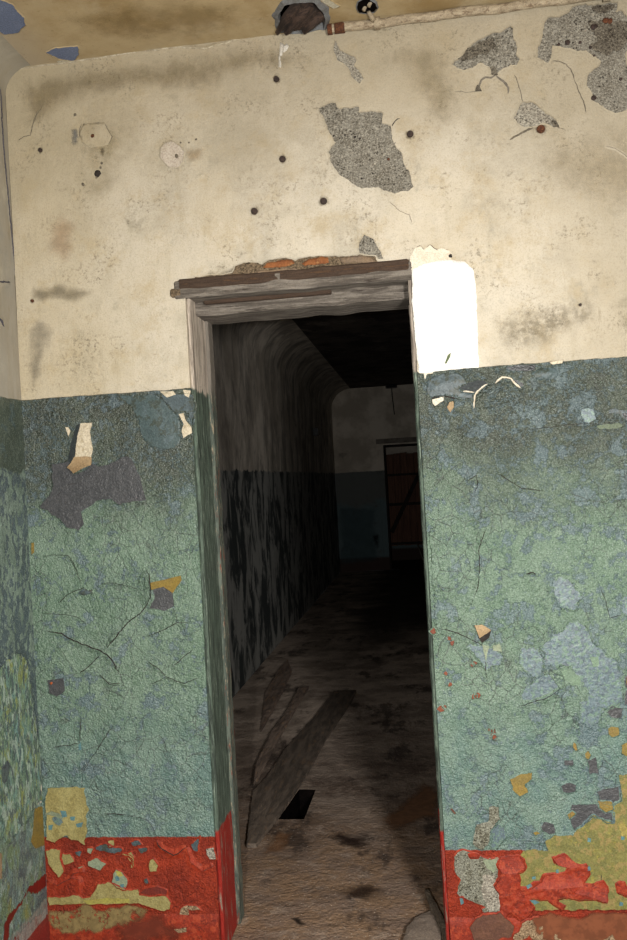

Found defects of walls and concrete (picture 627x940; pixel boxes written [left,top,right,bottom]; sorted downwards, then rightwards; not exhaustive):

peeling [0,0,27,35]
flaking render [451,25,563,140]
flaking render [536,1,627,114]
flaking render [318,102,415,196]
peeling [38,422,147,531]
crack [42,540,200,688]
peeling [429,623,504,678]
peeling [515,575,627,758]
crack [53,717,113,776]
peeling [0,651,203,940]
peeling [189,835,218,861]
peeling [453,771,627,940]